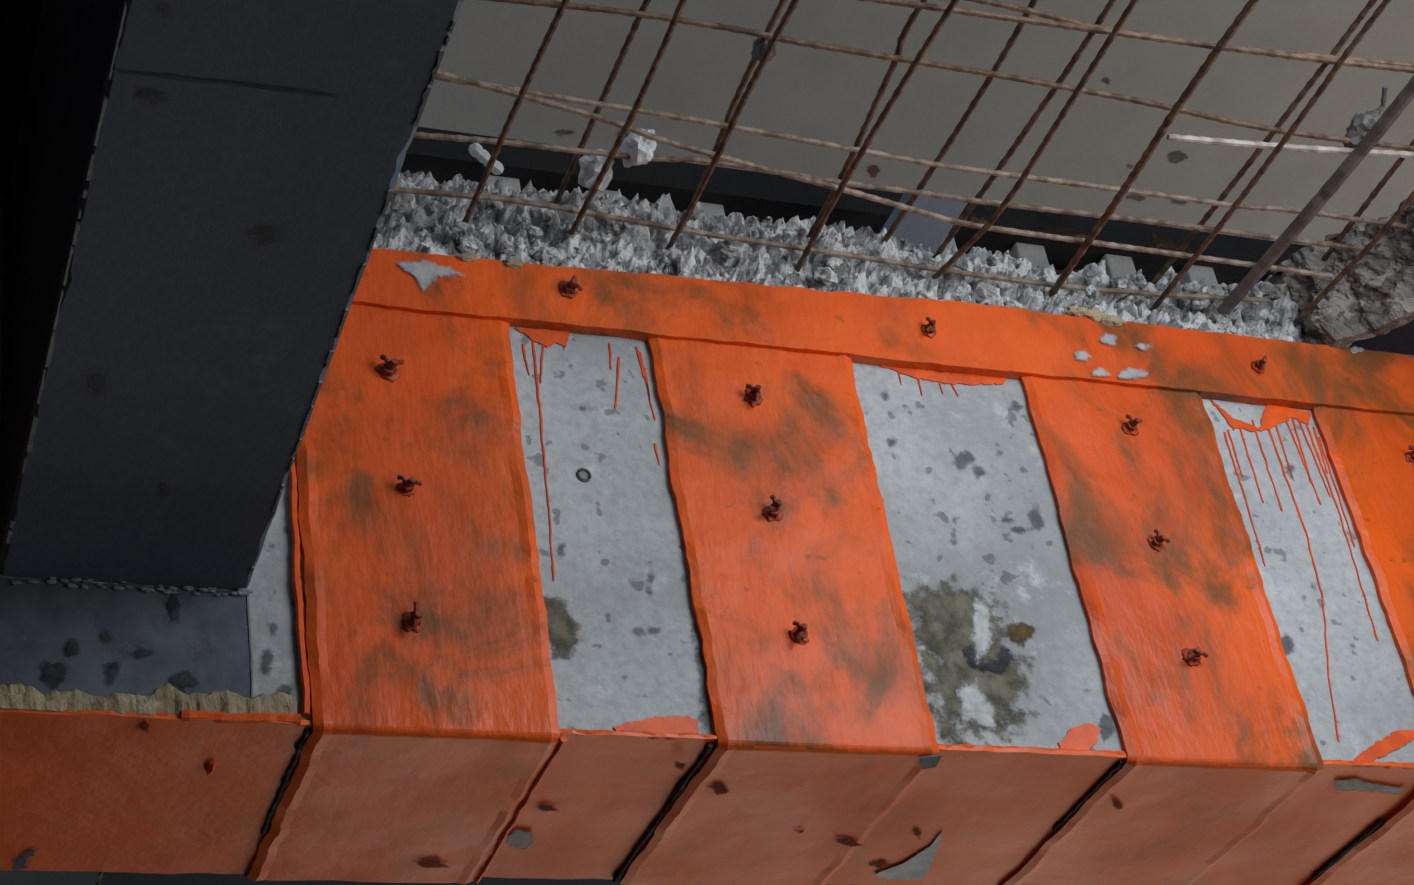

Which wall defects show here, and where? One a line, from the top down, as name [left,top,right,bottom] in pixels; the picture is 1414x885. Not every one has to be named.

rust [867,165,880,177]
spalling [373,143,1414,353]
peeling [1075,351,1148,379]
water stain [1007,622,1035,646]
peeling [1335,779,1406,794]
peeling [873,830,943,880]